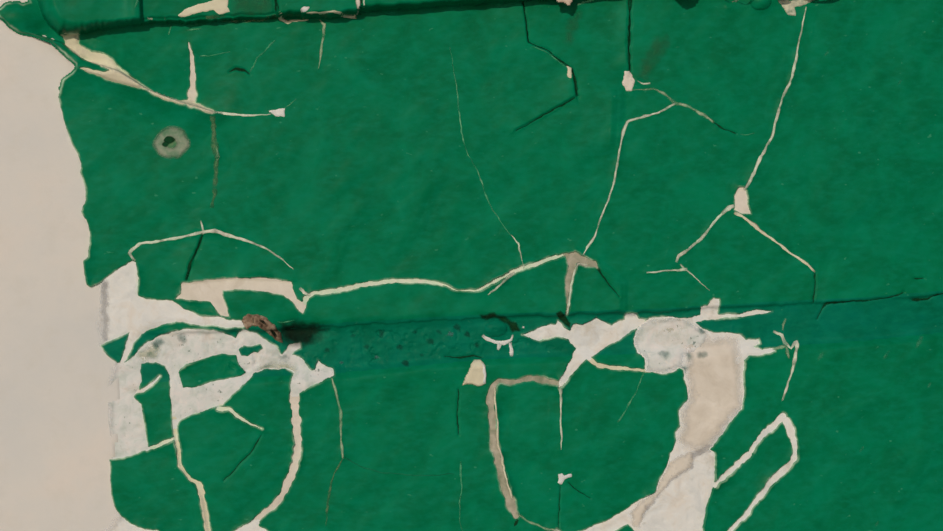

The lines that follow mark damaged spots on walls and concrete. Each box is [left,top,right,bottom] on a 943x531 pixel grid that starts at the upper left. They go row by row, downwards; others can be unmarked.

peeling [178,0,230,17]
peeling [61,33,294,117]
crack [128,0,943,318]
peeling [100,261,343,480]
peeling [448,251,775,531]
peeling [107,511,158,531]
peeling [235,519,267,531]